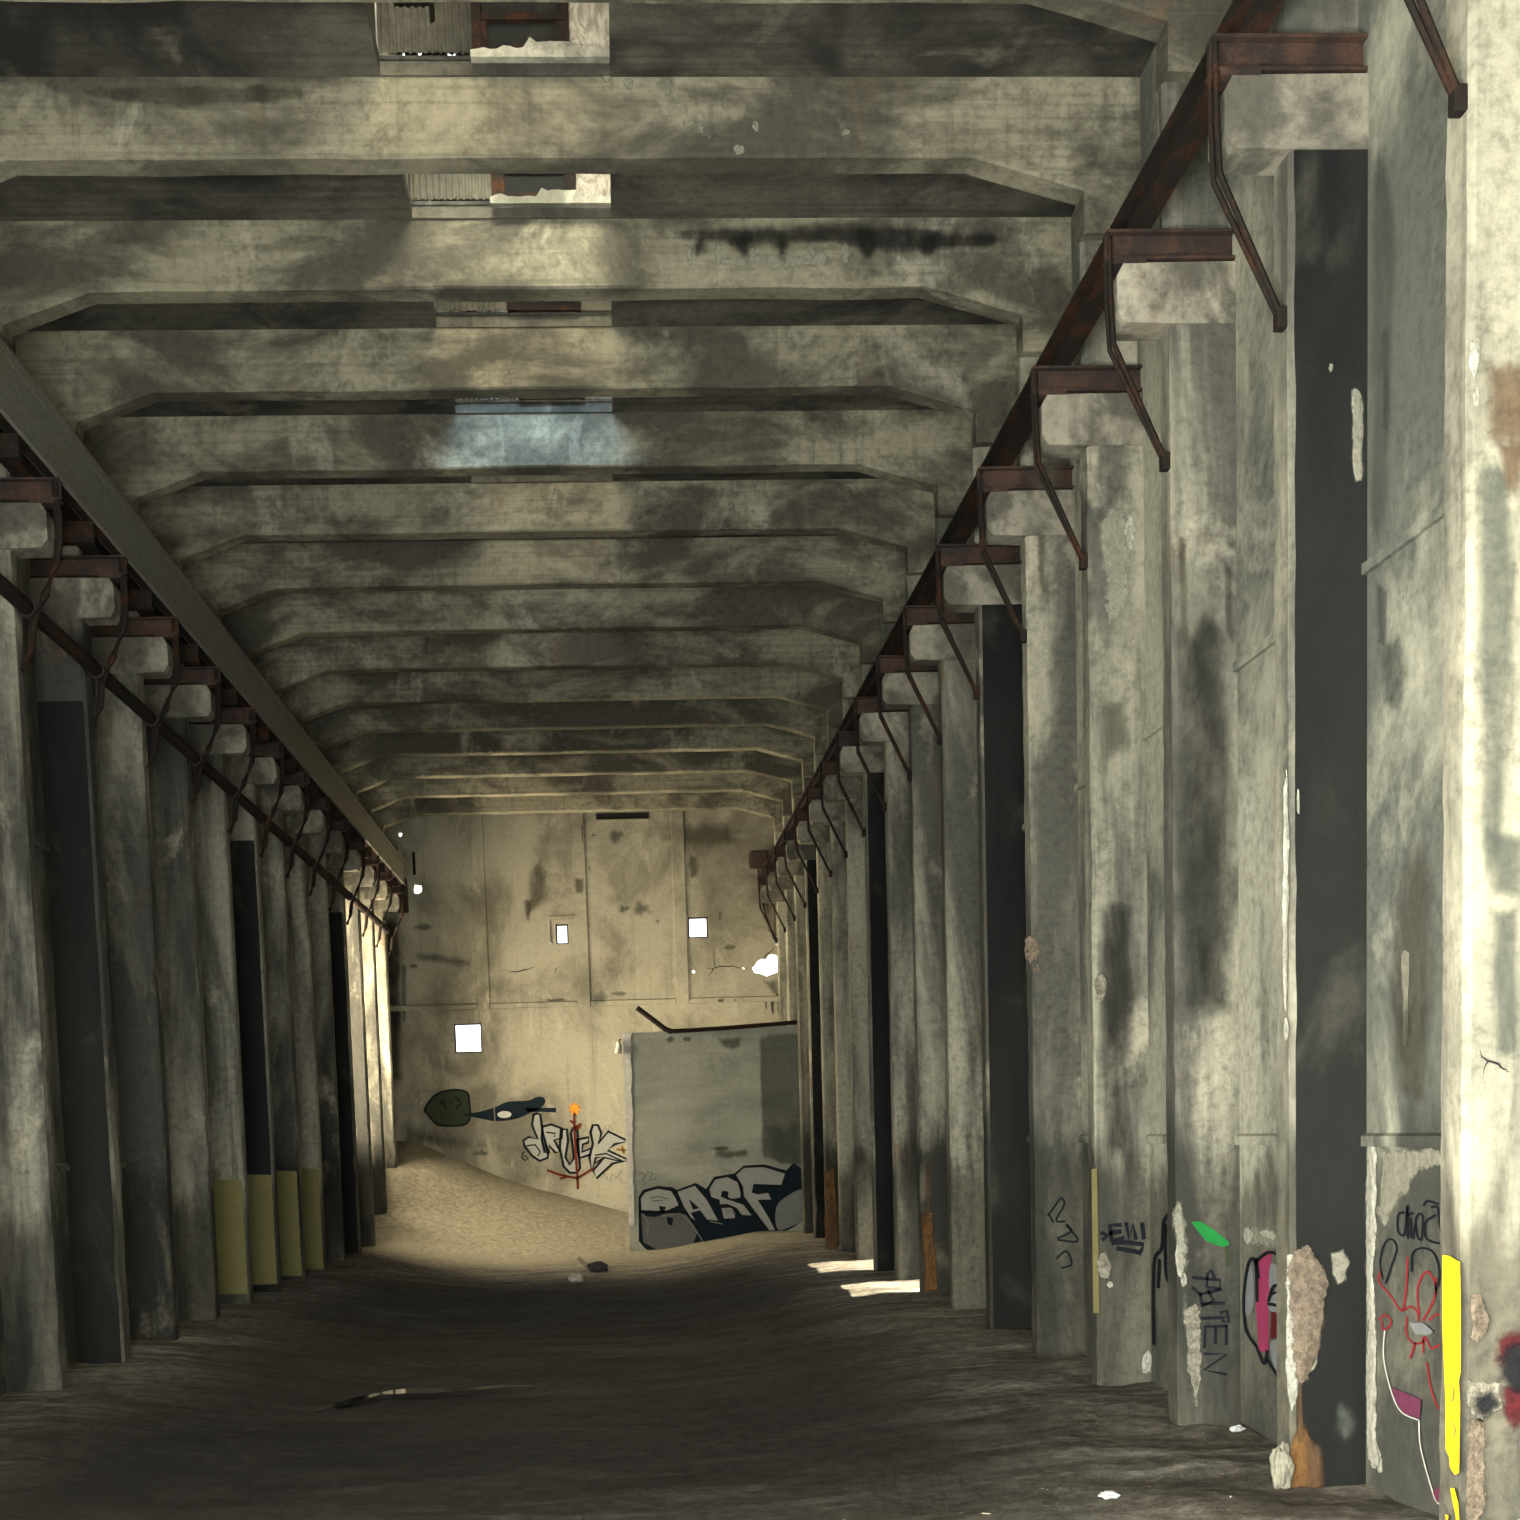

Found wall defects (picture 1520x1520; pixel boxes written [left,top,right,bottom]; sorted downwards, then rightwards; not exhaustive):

damp [736,237,747,255]
peeling [1173,1203,1188,1287]
peeling [1183,1304,1202,1402]
spalling [1243,1147,1441,1473]